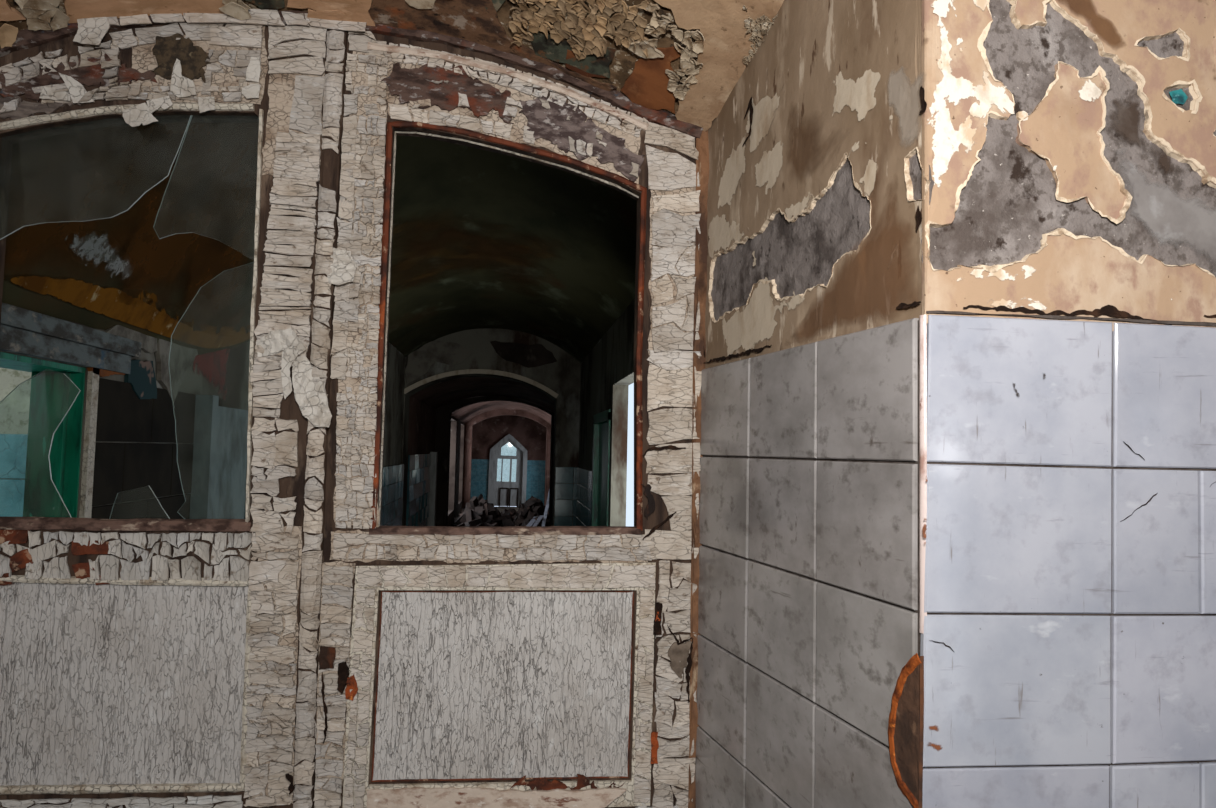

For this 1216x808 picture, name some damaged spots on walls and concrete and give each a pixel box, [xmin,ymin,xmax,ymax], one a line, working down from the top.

peeling [0,0,216,127]
peeling [242,57,261,99]
peeling [222,0,285,18]
peeling [380,62,645,182]
peeling [368,0,705,114]
spalling [832,0,1216,281]
spalling [708,93,877,356]
leakage [798,206,908,338]
crack [963,305,1172,325]
corrosion [318,646,358,701]
crack [285,773,295,795]